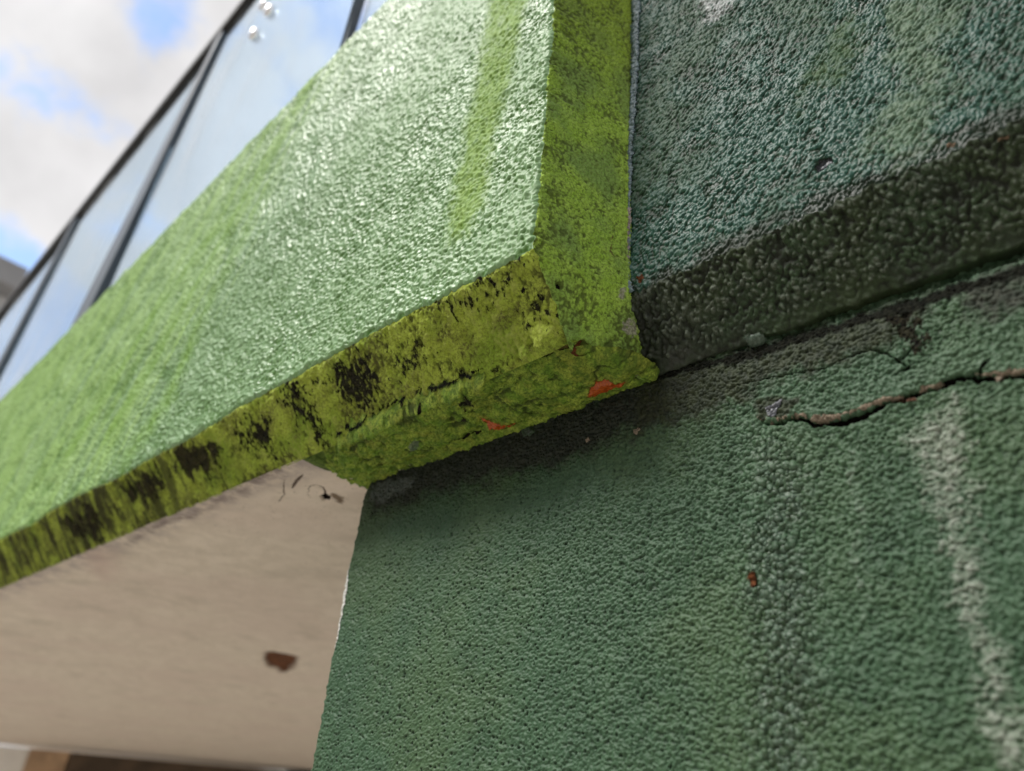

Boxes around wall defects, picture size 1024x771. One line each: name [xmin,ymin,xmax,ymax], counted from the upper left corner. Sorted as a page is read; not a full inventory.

water stain [55,141,438,510]
water stain [435,257,559,334]
corrosion [576,373,635,401]
crack [760,349,1024,428]
water stain [361,386,654,530]
water stain [56,501,142,590]